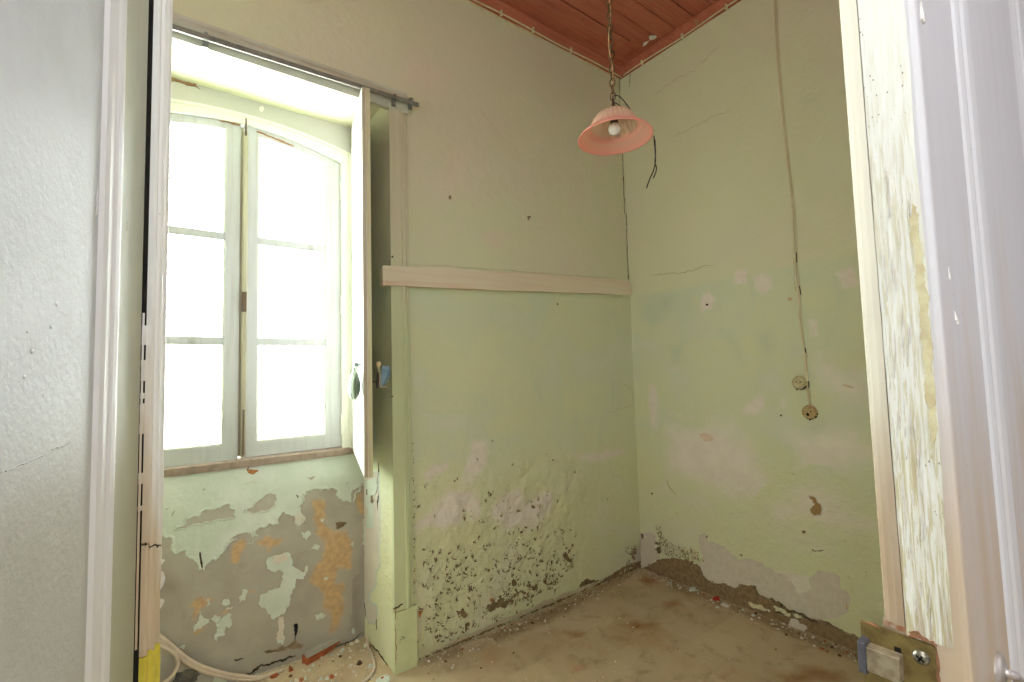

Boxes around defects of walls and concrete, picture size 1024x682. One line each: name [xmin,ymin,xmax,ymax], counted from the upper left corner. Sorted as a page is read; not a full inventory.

crack [416,154,714,280]
peeling [648,338,880,557]
peeling [872,148,937,575]
peeling [160,470,381,682]
damp [408,557,864,682]
peeling [578,525,851,620]